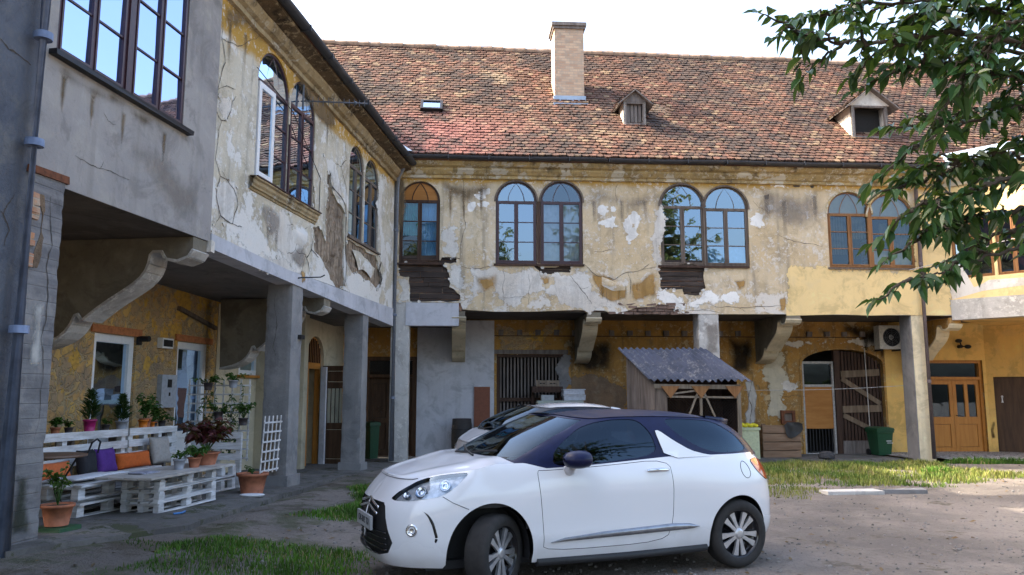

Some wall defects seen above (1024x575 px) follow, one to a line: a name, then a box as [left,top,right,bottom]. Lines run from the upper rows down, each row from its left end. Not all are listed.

crack [215,31,259,227]
peeling [258,153,740,315]
peeling [748,205,773,228]
leakage [731,341,757,424]
peeling [762,341,826,421]
peeling [844,338,875,348]